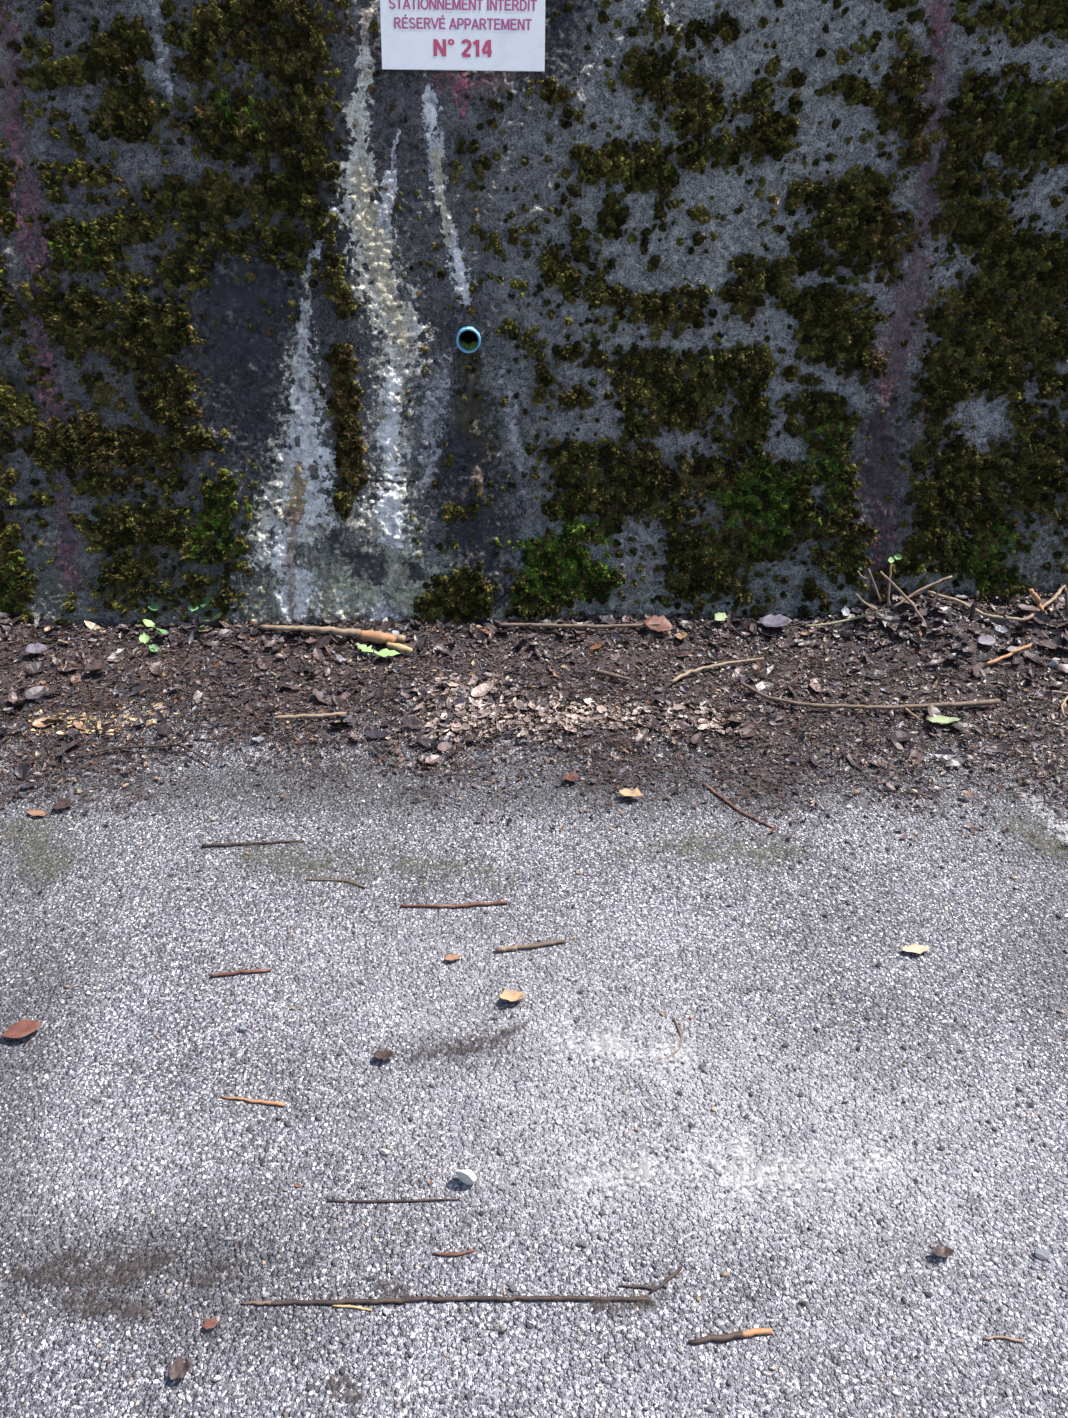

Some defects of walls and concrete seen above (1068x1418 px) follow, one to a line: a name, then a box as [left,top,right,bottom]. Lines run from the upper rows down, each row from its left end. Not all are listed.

damp [108,0,177,106]
damp [532,0,598,96]
damp [172,0,553,630]